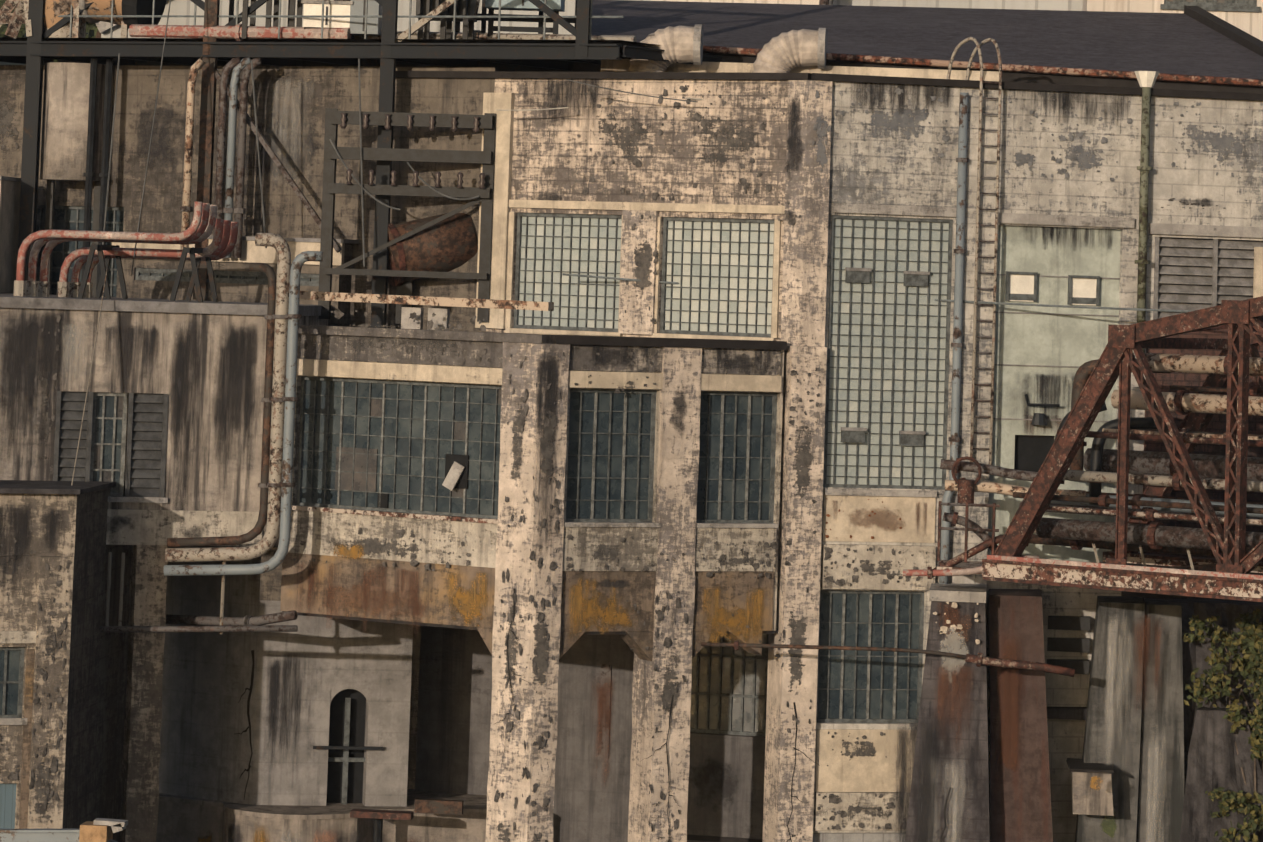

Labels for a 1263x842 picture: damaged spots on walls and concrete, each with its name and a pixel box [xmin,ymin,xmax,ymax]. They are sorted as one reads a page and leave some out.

peeling [585,84,801,226]
peeling [626,215,658,296]
damp [2,314,79,432]
damp [106,327,156,369]
damp [174,329,197,443]
damp [215,327,256,448]
spalling [789,368,821,504]
damp [0,507,61,596]
peeling [499,354,581,741]
peeling [824,547,927,587]
crack [236,650,254,799]
peeling [771,611,812,734]